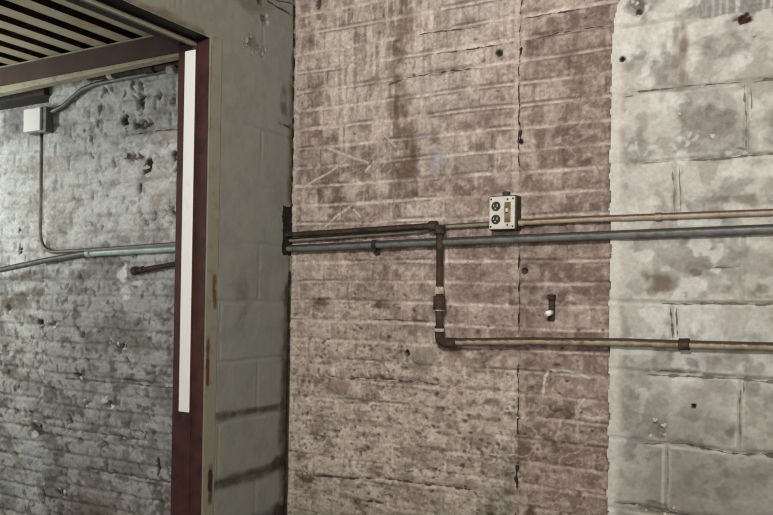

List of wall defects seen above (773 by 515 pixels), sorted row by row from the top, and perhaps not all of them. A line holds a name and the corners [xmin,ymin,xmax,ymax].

crack [389,44,500,85]
crack [415,27,478,36]
crack [518,0,605,184]
crack [515,243,523,331]
crack [514,363,522,435]
crack [512,463,520,515]